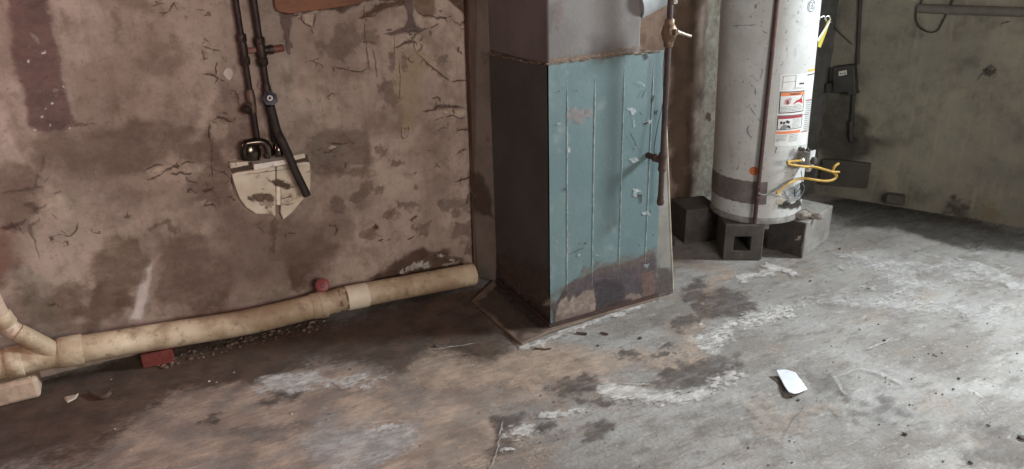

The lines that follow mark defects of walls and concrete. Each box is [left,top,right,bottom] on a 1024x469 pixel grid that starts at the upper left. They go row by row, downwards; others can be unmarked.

crack [146,2,259,208]
crack [312,6,469,204]
crack [2,161,78,255]
damp [487,262,803,464]